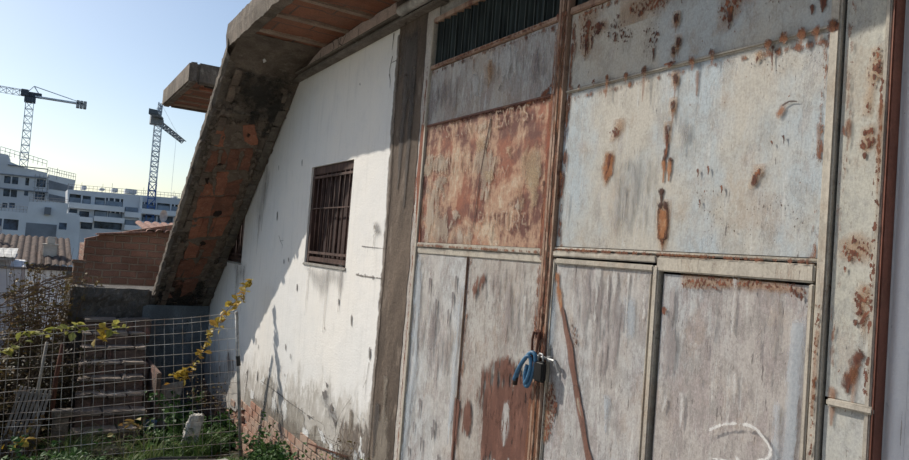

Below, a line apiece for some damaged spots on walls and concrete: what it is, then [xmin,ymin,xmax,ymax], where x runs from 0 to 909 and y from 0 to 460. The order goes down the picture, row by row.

corrosion [741,0,853,162]
spalling [168,118,260,299]
corrosion [411,0,820,460]
corrosion [830,47,884,425]
flaking render [245,371,368,460]